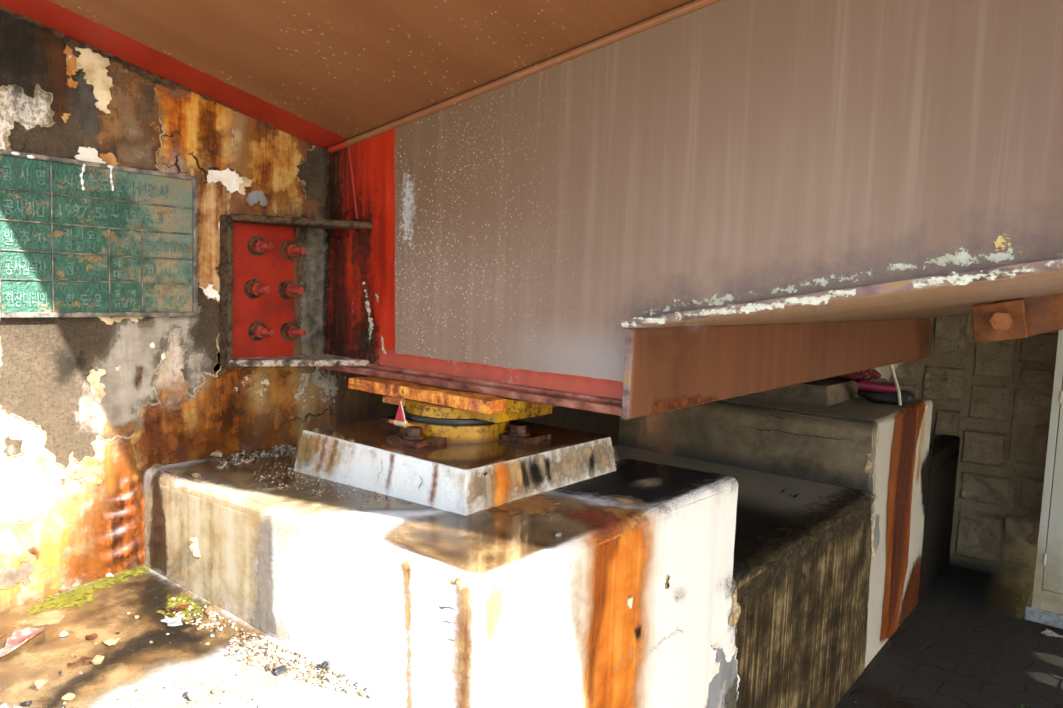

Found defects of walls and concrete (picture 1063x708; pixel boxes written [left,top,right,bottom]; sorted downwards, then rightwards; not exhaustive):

peeling [0,10,166,171]
corrosion [155,78,303,301]
peeling [207,168,268,208]
peeling [296,145,329,205]
corrosion [323,151,379,364]
peeling [621,229,1063,327]
peeling [0,264,226,500]
corrosion [402,559,412,708]
corrosion [456,587,472,708]
corrosion [461,440,649,708]
peeling [704,588,741,708]
corrosion [880,401,926,641]